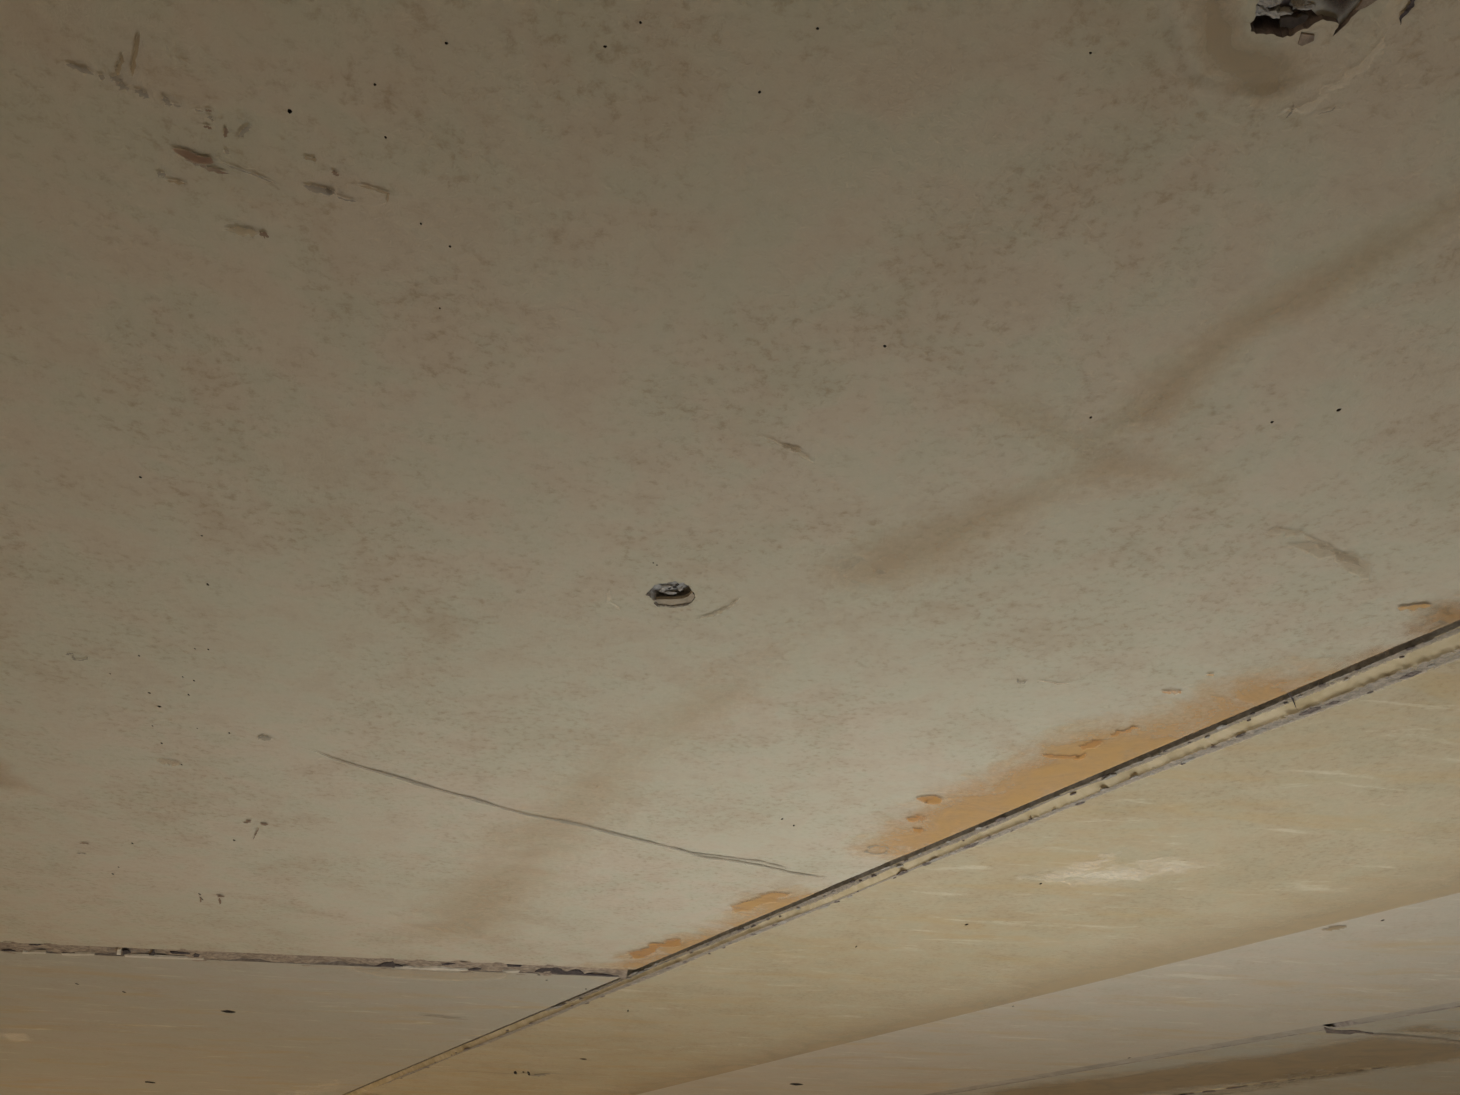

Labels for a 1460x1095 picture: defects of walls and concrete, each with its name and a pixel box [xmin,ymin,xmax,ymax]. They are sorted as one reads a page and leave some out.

hole [1250,0,1377,46]
rust [874,677,1324,855]
crack [318,752,821,878]
rust [730,893,812,927]
rust [621,935,716,968]